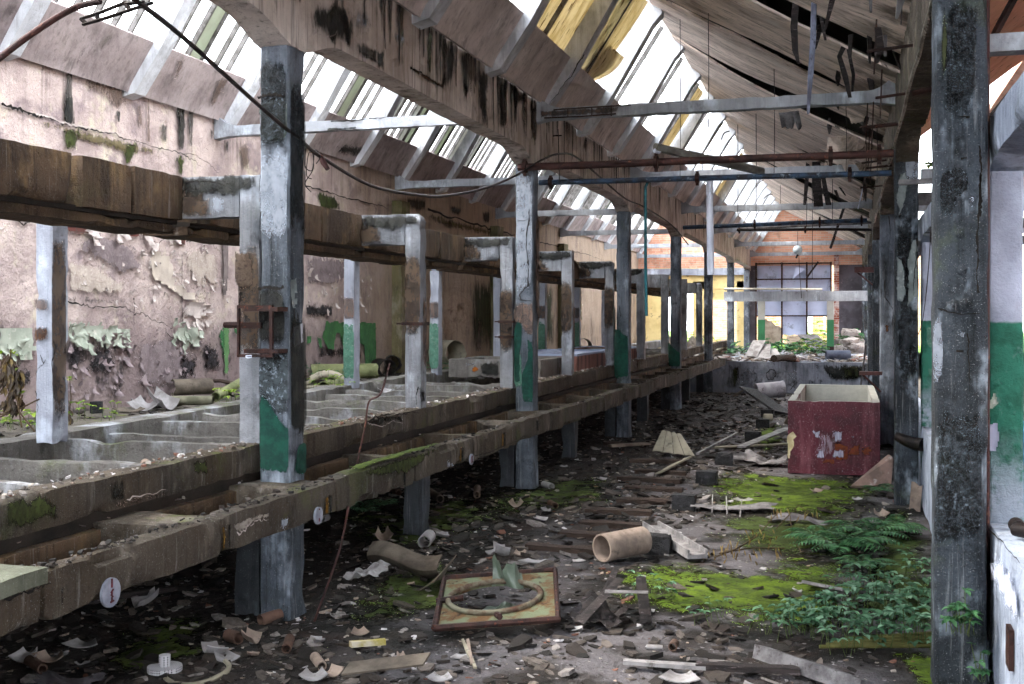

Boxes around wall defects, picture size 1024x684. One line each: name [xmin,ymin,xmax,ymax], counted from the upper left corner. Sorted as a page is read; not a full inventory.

damp [314,0,404,69]
damp [64,73,75,125]
damp [87,79,124,122]
crack [1,103,234,186]
damp [138,99,194,149]
damp [419,28,629,195]
peeling [0,328,36,364]
flaking render [67,227,344,400]